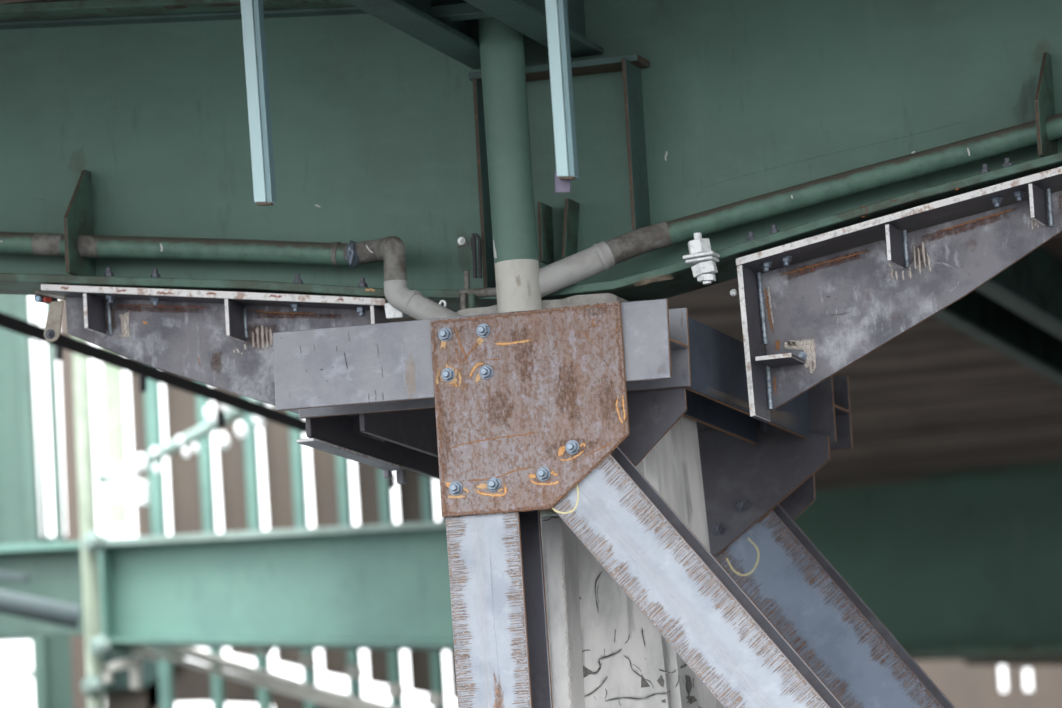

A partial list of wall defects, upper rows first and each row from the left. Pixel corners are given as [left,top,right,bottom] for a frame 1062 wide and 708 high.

rust [923,208,1016,241]
rust [782,249,871,279]
rust [117,290,207,324]
rust [250,310,337,318]
rust [764,285,774,331]
rust [431,303,863,708]
rust [757,511,941,708]
crack [582,629,701,708]